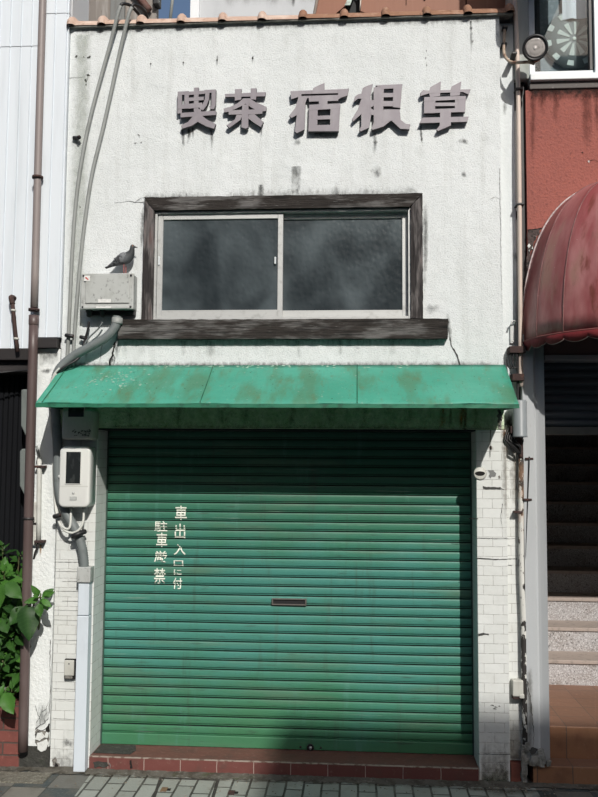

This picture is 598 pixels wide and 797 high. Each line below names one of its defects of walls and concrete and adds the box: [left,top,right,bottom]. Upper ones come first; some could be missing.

damp [531,89,598,97]
crack [86,332,118,365]
crack [448,320,460,365]
spalling [35,724,50,752]
spalling [520,681,552,783]